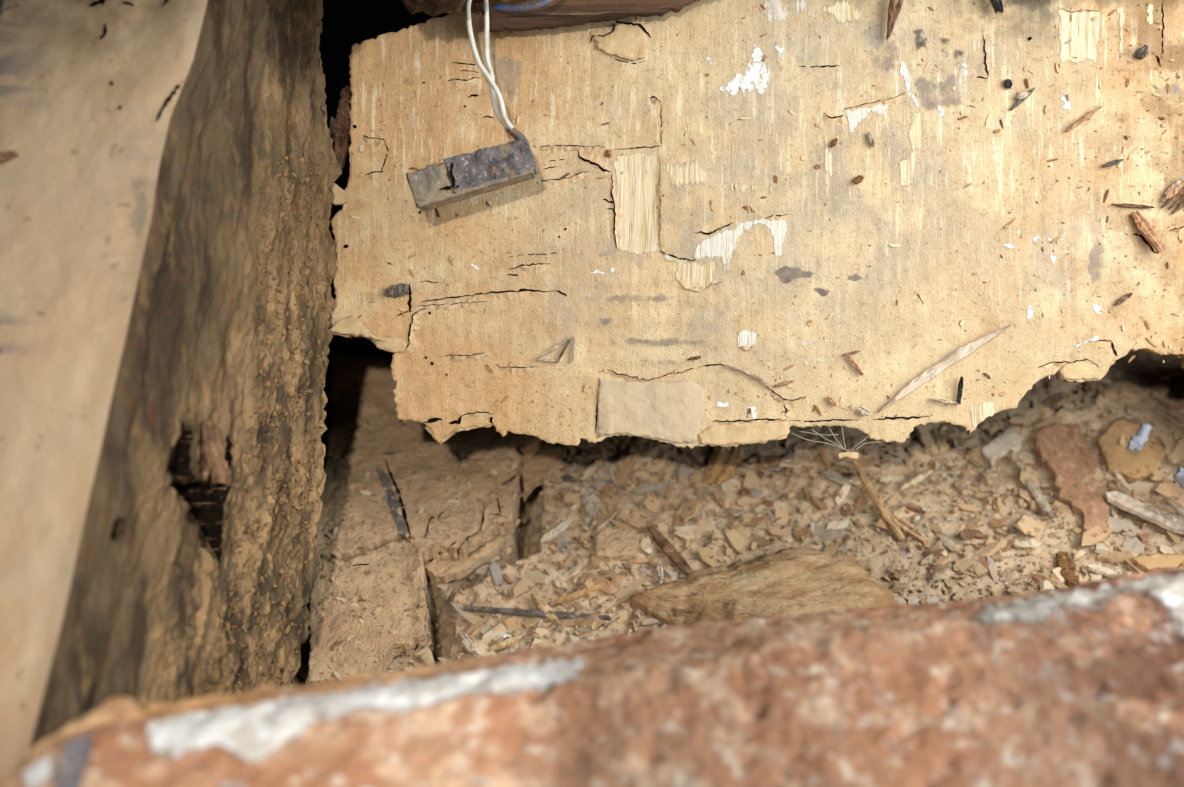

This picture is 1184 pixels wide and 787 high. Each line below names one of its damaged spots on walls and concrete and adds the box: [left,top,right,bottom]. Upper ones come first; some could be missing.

peeling [1058,6,1101,64]
peeling [1117,7,1125,59]
crack [533,96,663,249]
peeling [614,152,788,292]
leakage [993,229,1071,262]
peeling [328,315,407,353]
crack [397,252,567,375]
peeling [737,330,757,351]
crack [595,364,726,431]
peeling [597,379,788,445]
peeling [970,401,997,427]
peeling [1058,362,1107,380]